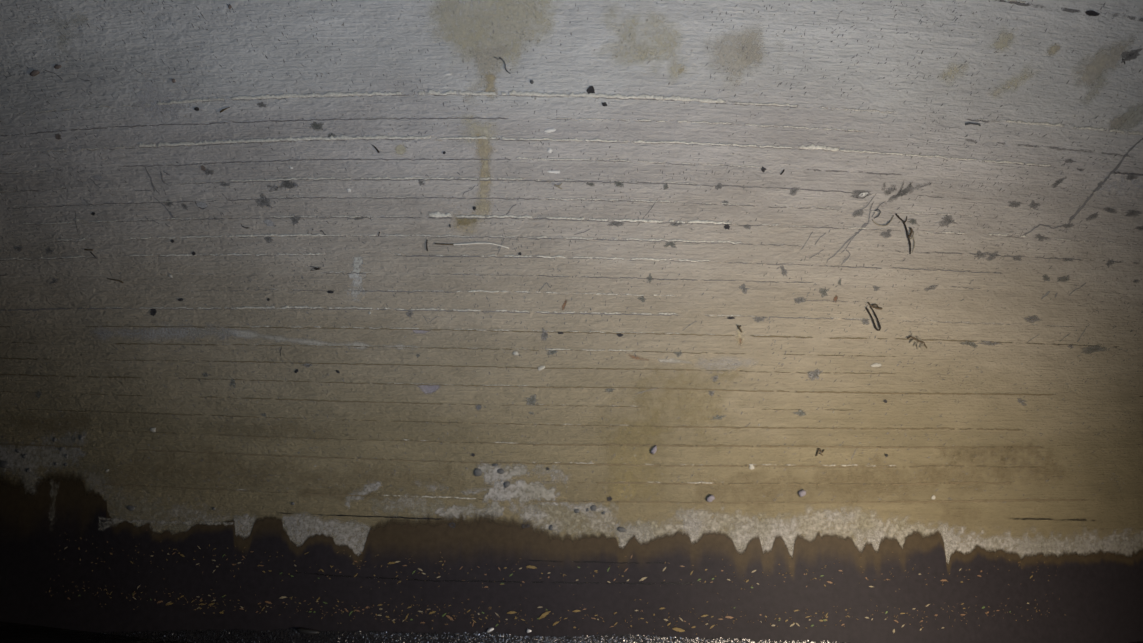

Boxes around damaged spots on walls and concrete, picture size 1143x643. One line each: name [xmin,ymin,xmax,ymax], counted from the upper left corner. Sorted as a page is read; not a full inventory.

crack [1024,138,1143,235]
leakage [0,475,1143,643]